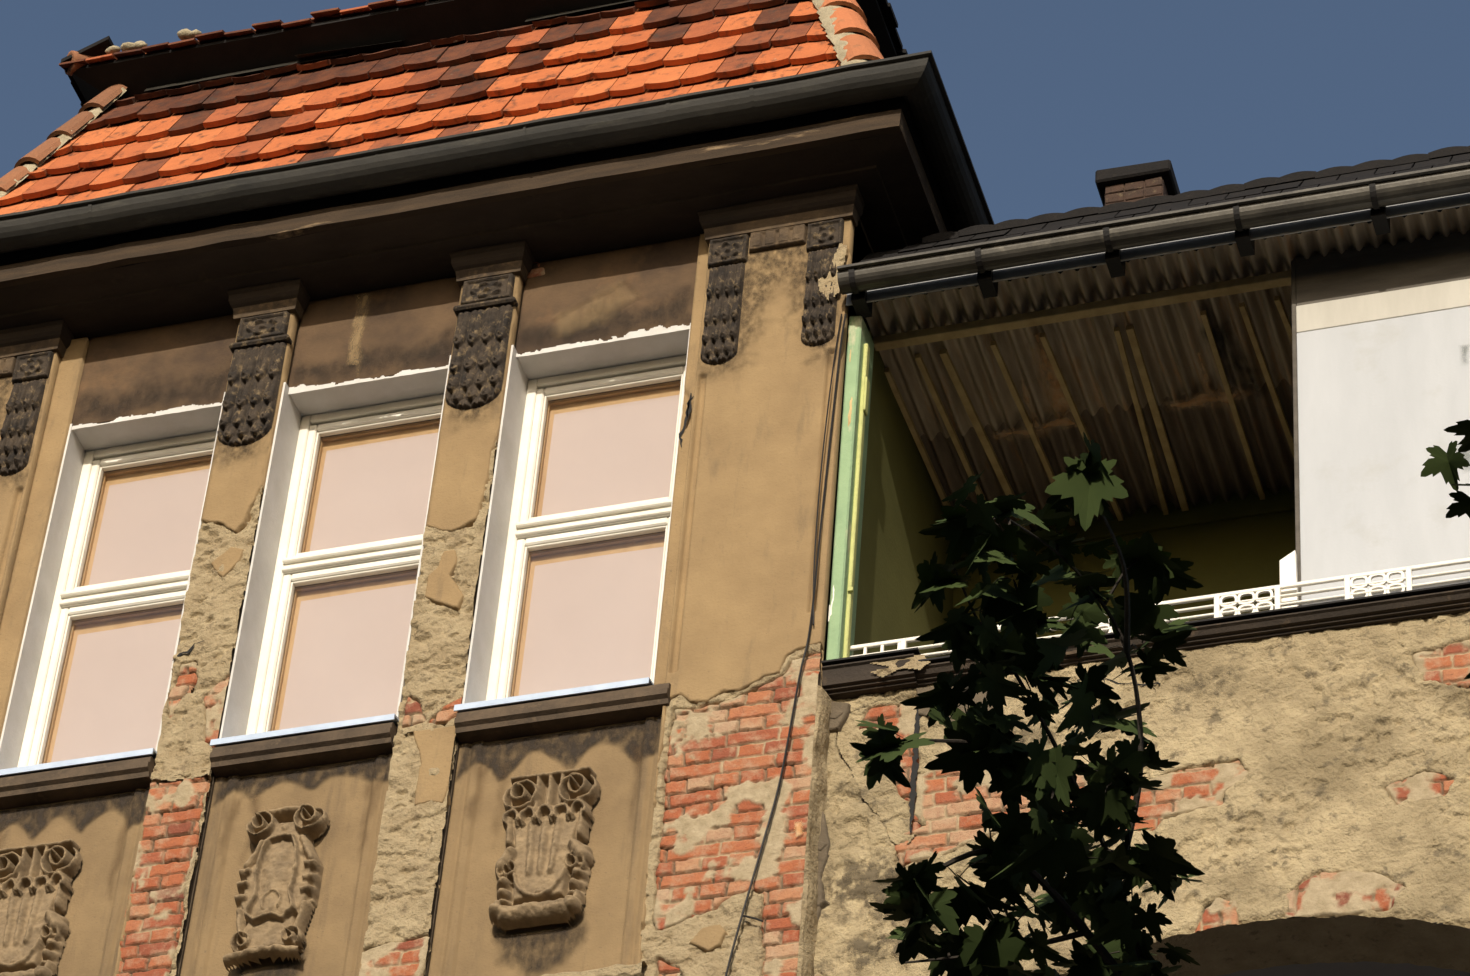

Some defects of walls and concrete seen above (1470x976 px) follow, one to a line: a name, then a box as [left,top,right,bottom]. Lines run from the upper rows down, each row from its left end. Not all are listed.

peeling [113,485,263,976]
spalling [359,440,497,976]
peeling [641,643,1030,976]
spalling [1070,774,1087,803]
spalling [1107,761,1248,838]